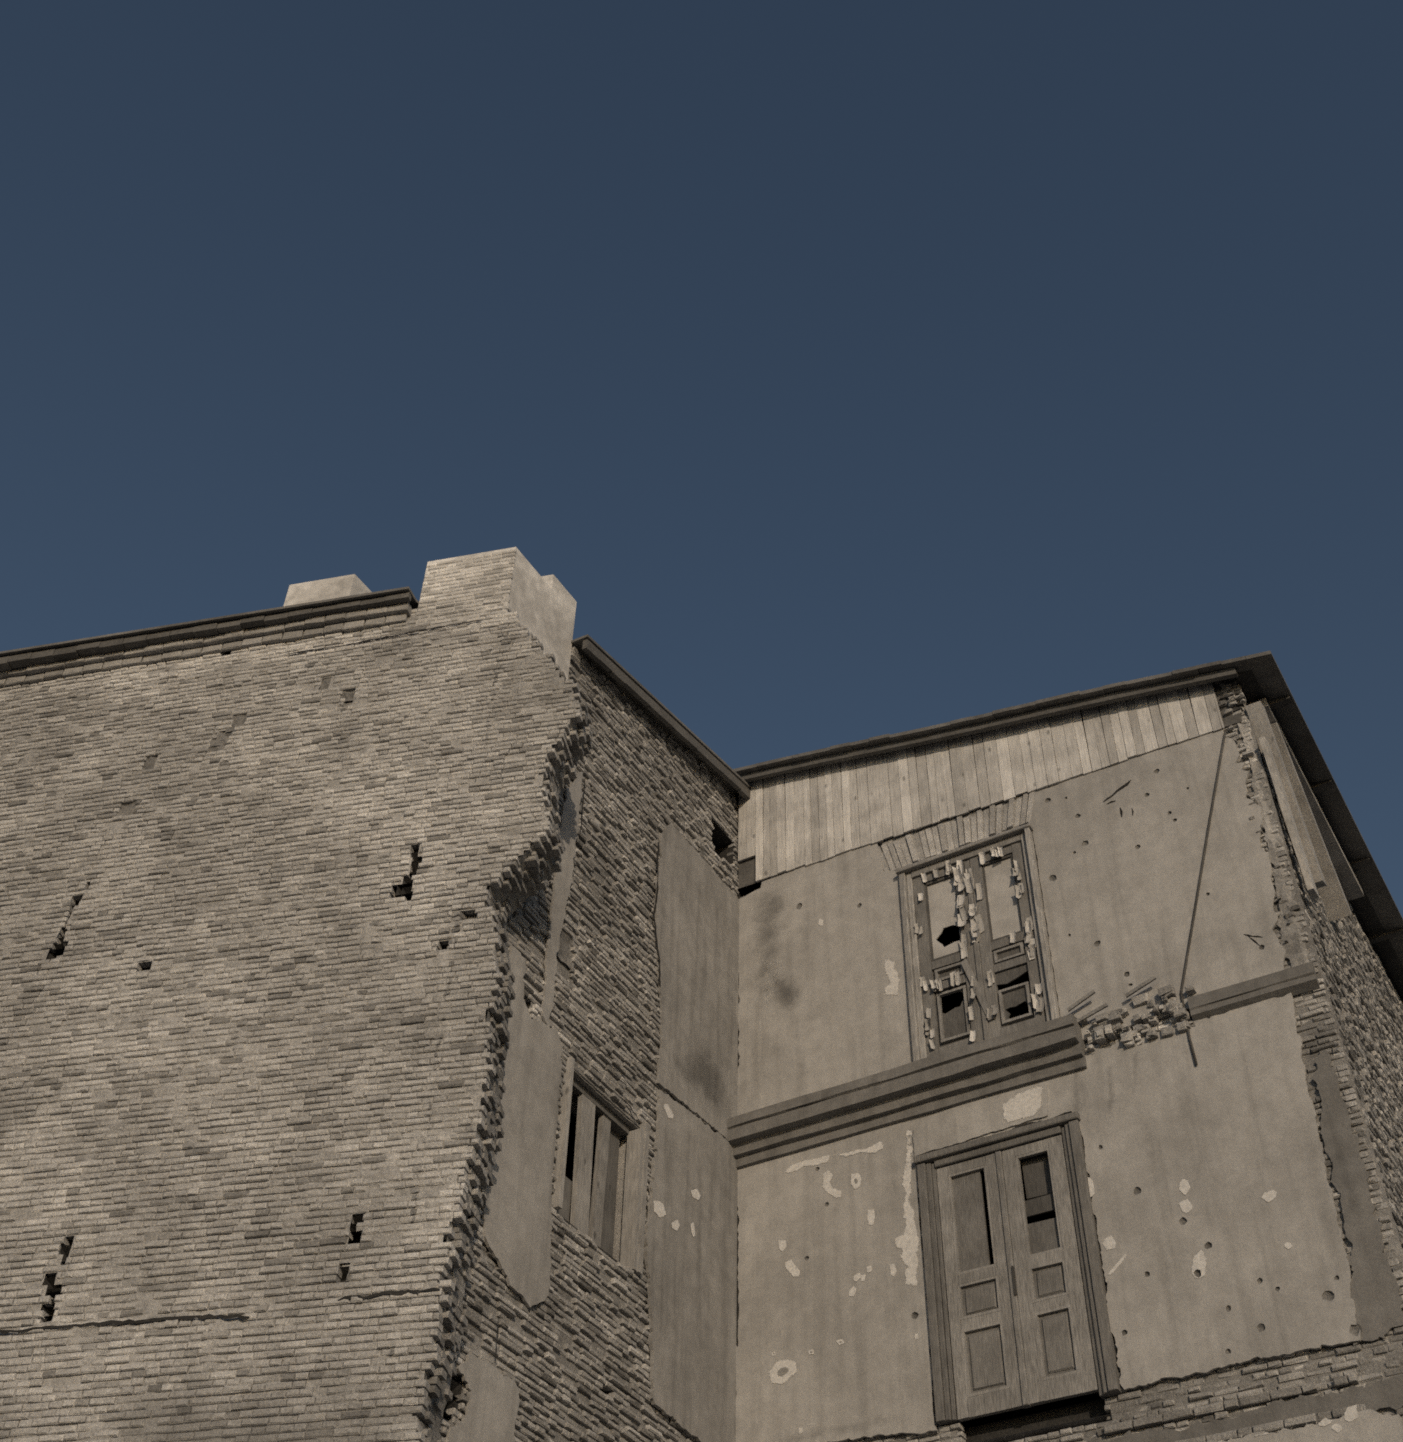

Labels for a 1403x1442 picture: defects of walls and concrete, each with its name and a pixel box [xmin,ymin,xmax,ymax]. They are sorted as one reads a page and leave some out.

spalling [203,714,247,756]
spalling [392,847,422,901]
spalling [46,896,81,960]
peeling [1002,1087,1042,1124]
peeling [785,1142,883,1207]
spalling [350,1214,363,1244]
peeling [890,1130,919,1286]
spalling [40,1240,73,1322]
peeling [778,1240,809,1277]
peeling [849,1266,872,1296]
peeling [768,1350,814,1384]
spalling [443,1364,463,1425]